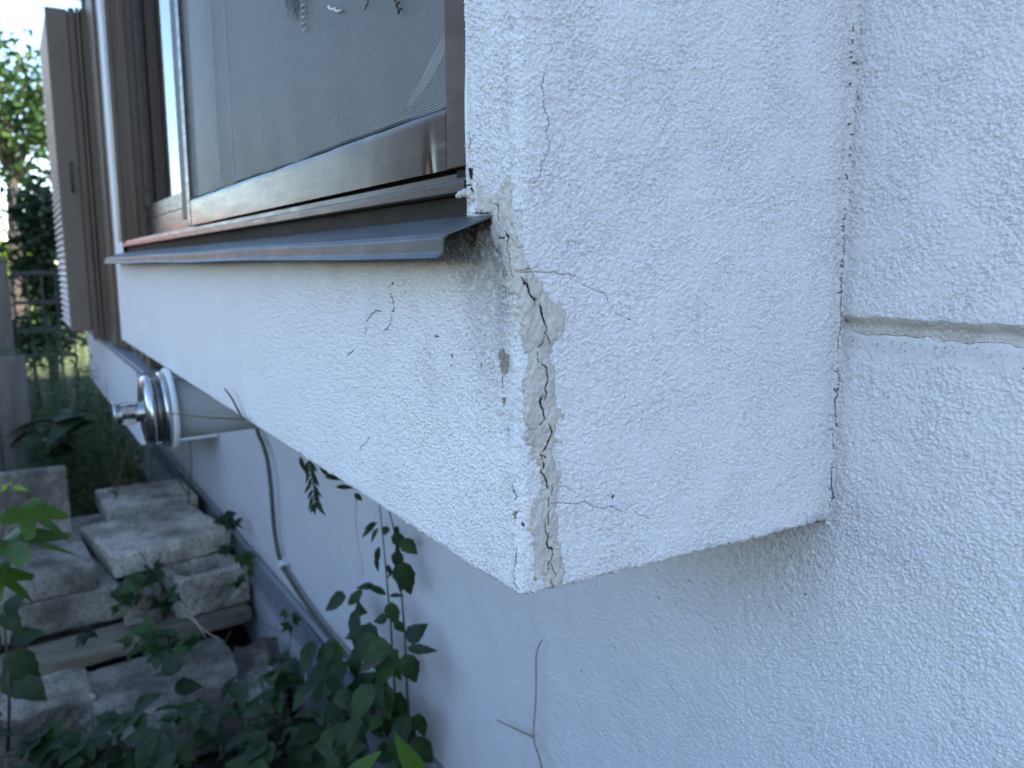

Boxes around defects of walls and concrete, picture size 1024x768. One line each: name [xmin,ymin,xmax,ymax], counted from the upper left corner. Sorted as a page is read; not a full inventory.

crack [494,204,650,589]
crack [815,5,1024,525]